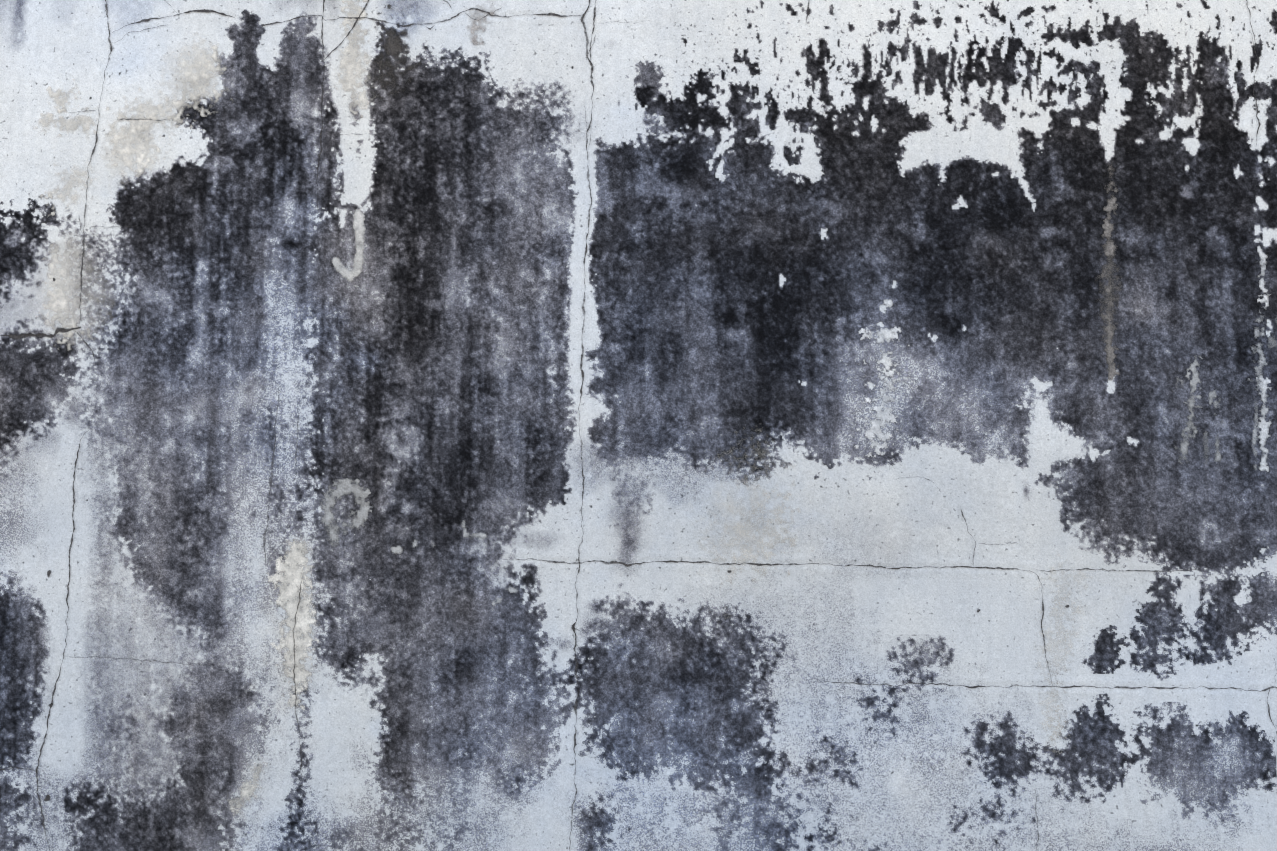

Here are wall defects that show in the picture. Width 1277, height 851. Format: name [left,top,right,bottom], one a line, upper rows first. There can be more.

leakage [350,98,362,126]
crack [2,0,232,360]
leakage [0,195,76,311]
leakage [579,105,1277,680]
crack [262,0,1277,849]
crack [0,430,108,850]
leakage [887,636,955,692]
leakage [635,789,674,851]
leakage [868,827,928,851]
leakage [1043,820,1076,851]
leakage [1085,829,1220,851]